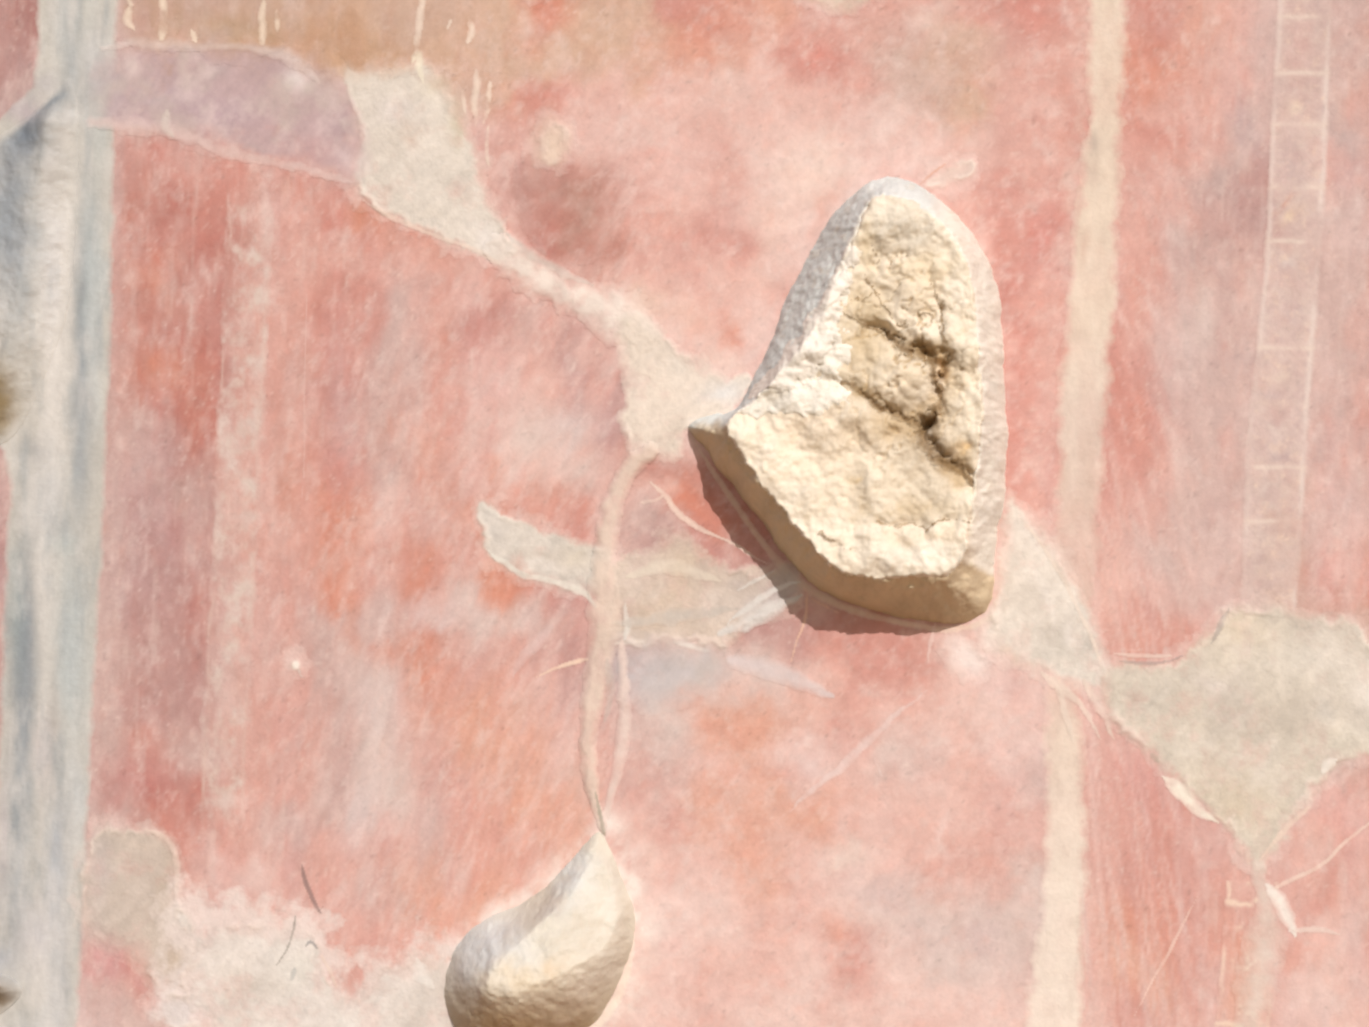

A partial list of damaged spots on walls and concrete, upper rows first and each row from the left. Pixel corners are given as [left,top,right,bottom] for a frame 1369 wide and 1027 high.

flaking render [342,67,508,269]
peeling [520,105,584,177]
flaking render [468,492,594,603]
crack [536,441,660,836]
flaking render [615,523,805,649]
flaking render [932,484,1369,877]